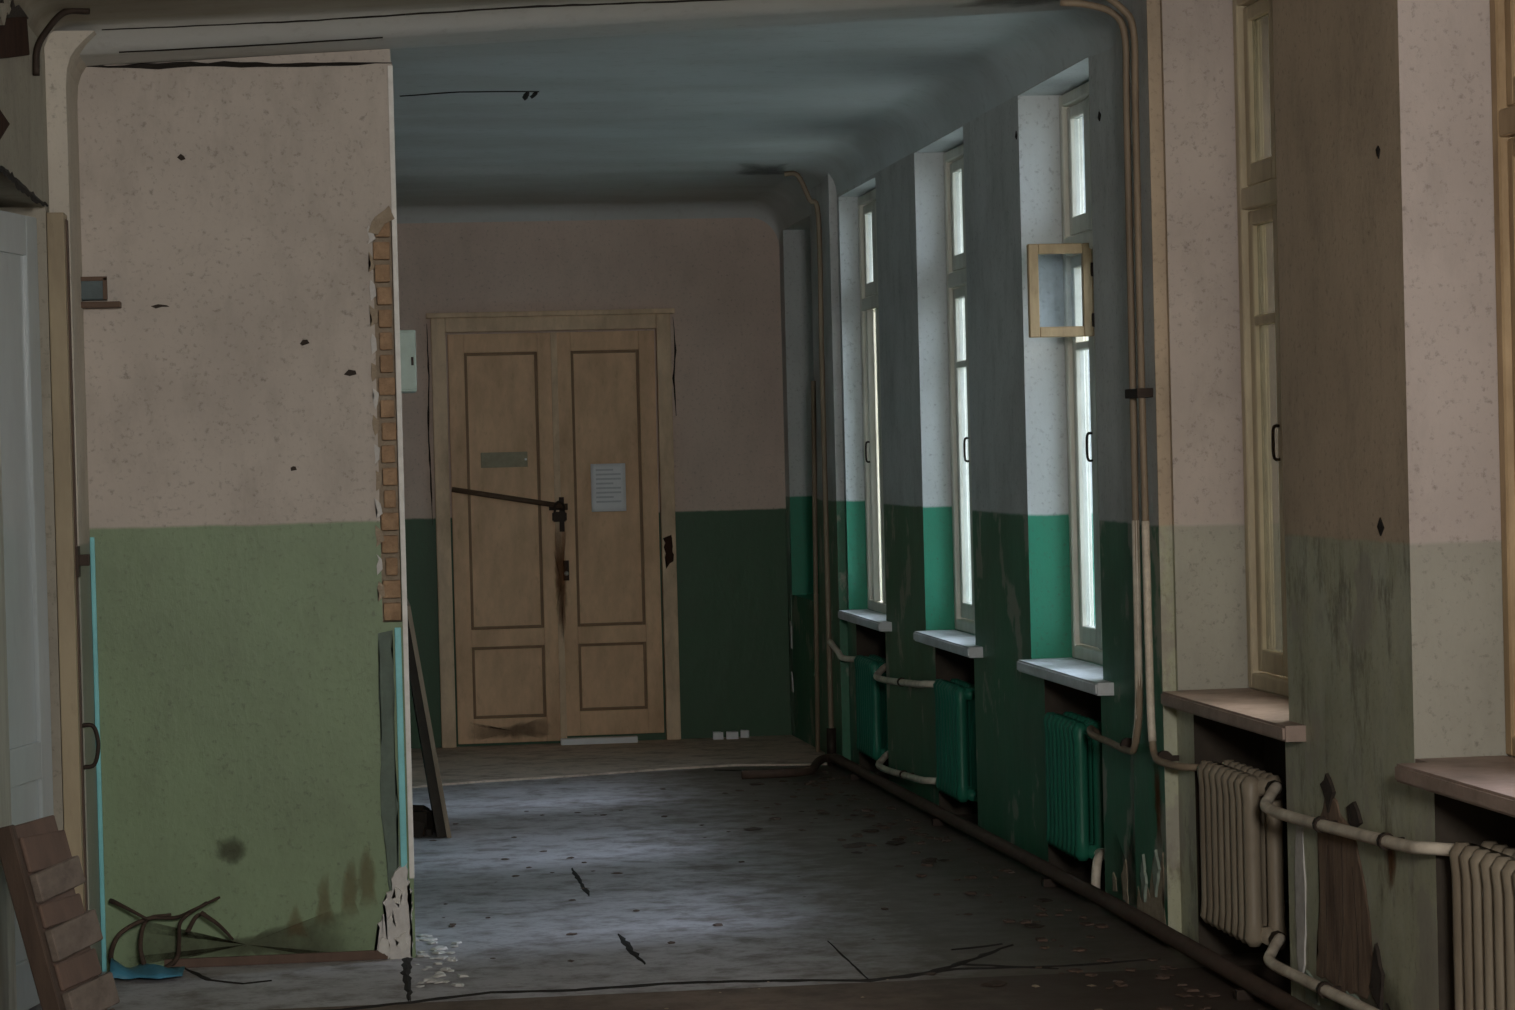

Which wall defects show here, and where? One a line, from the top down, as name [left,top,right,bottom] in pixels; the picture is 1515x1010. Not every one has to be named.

flaking render [0,0,28,25]
flaking render [344,206,413,960]
flaking render [1295,773,1385,1010]